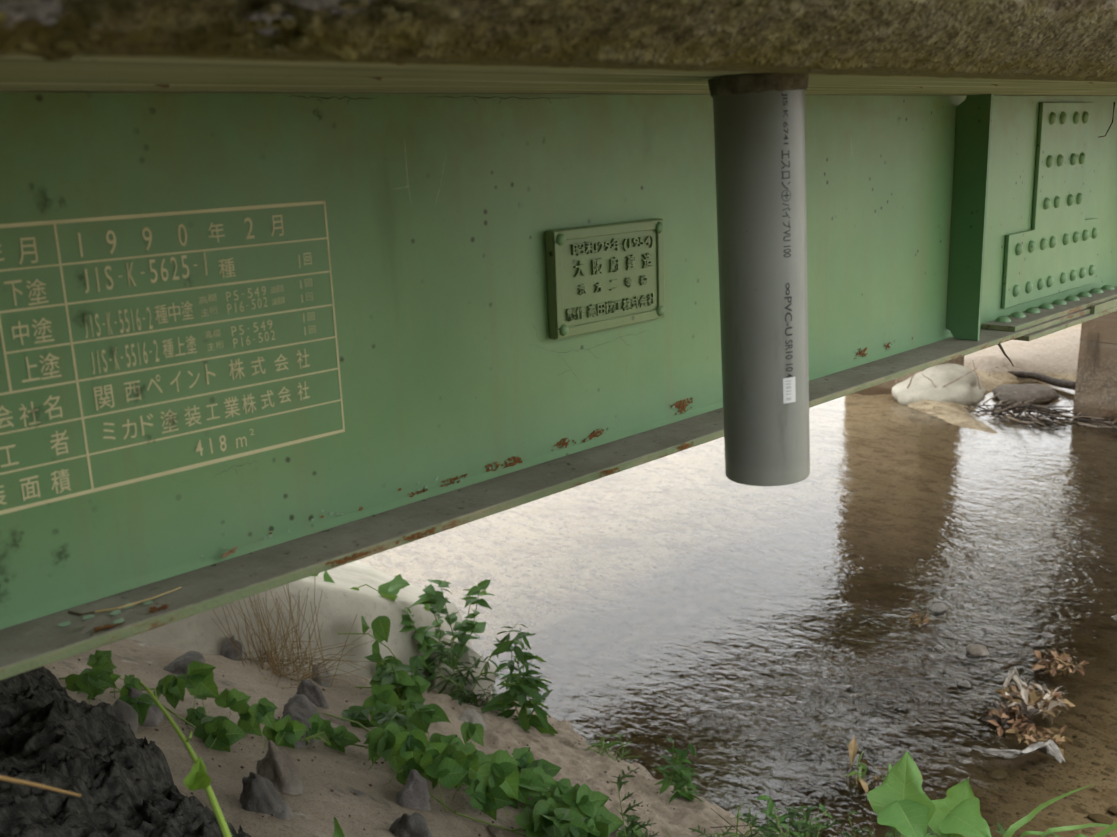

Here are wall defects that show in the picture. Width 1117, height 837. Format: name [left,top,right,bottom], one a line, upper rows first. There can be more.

rust [671,398,693,415]
rust [551,429,604,451]
rust [485,456,522,472]
rust [408,473,467,497]